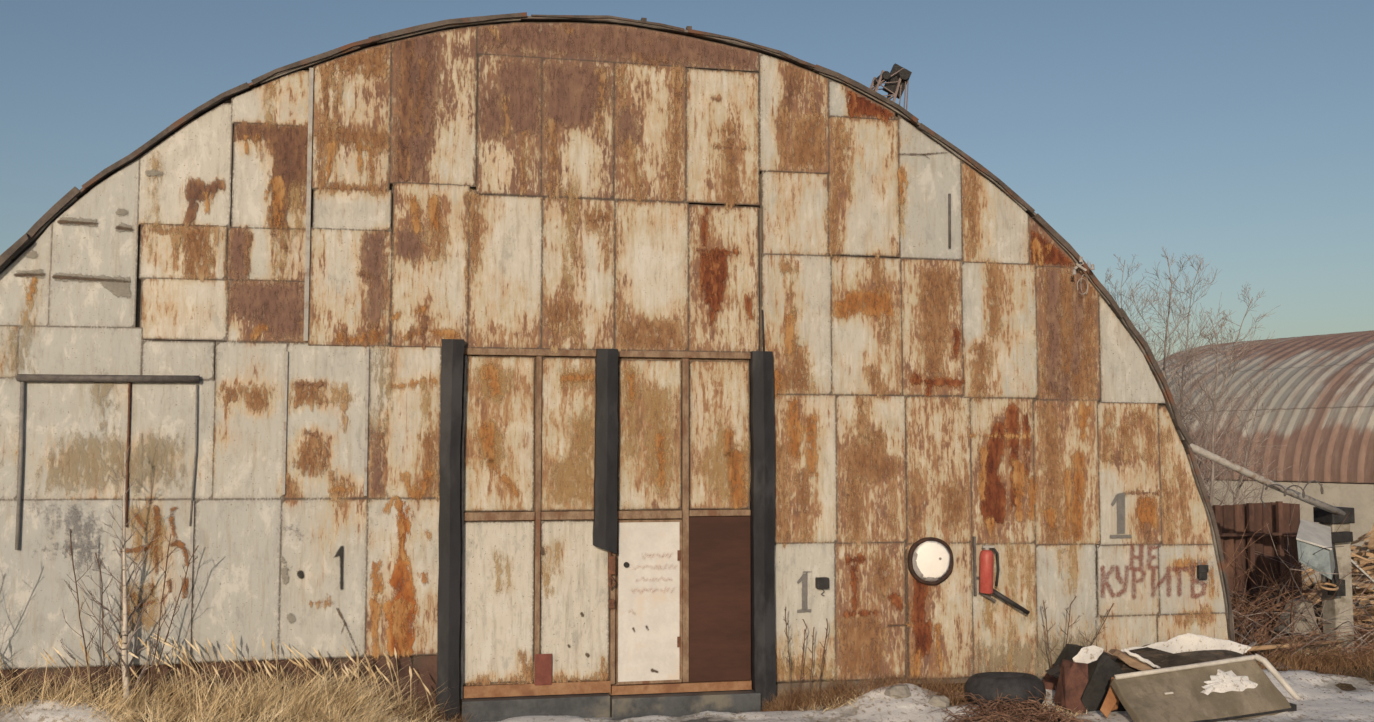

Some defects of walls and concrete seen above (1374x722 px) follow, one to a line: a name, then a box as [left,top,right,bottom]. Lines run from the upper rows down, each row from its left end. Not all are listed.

corrosion [219,383,274,412]
corrosion [142,34,460,349]
corrosion [285,377,440,659]
corrosion [464,191,484,294]
corrosion [475,420,519,497]
corrosion [479,23,758,389]
corrosion [616,301,688,498]
corrosion [697,421,750,509]
corrosion [834,254,896,344]
corrosion [836,365,943,677]
corrosion [910,171,1002,410]
corrosion [942,231,1191,628]